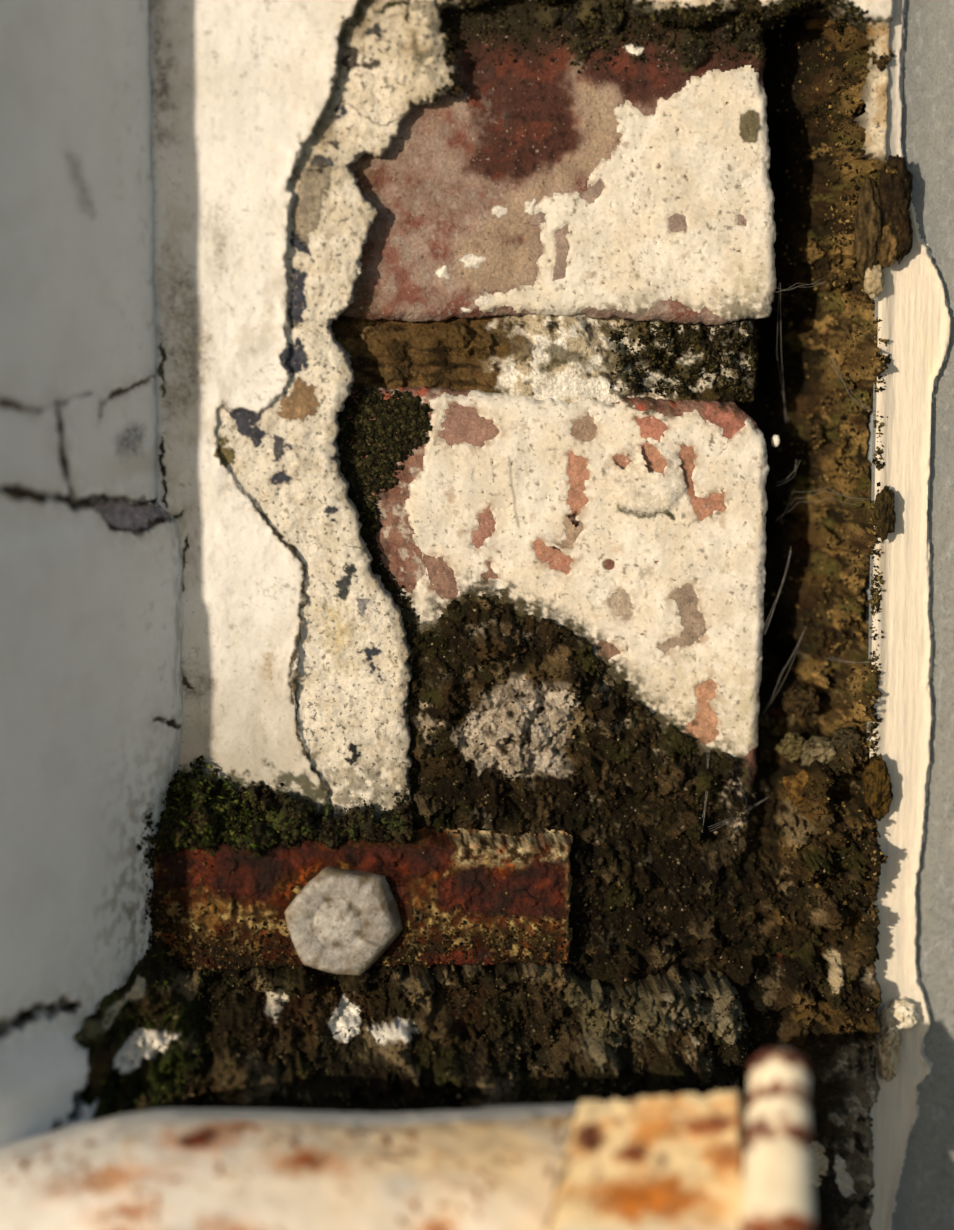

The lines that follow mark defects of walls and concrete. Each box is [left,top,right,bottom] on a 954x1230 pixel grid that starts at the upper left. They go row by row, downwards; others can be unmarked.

spalling [625,0,913,299]
peeling [524,198,570,281]
peeling [213,0,499,818]
crack [0,343,189,592]
peeling [533,412,597,575]
peeling [612,415,727,521]
spalling [873,485,896,542]
peeling [656,583,707,654]
water stain [161,526,884,1113]
corrosion [153,834,569,925]
peeling [328,996,419,1045]
peeling [821,949,844,994]